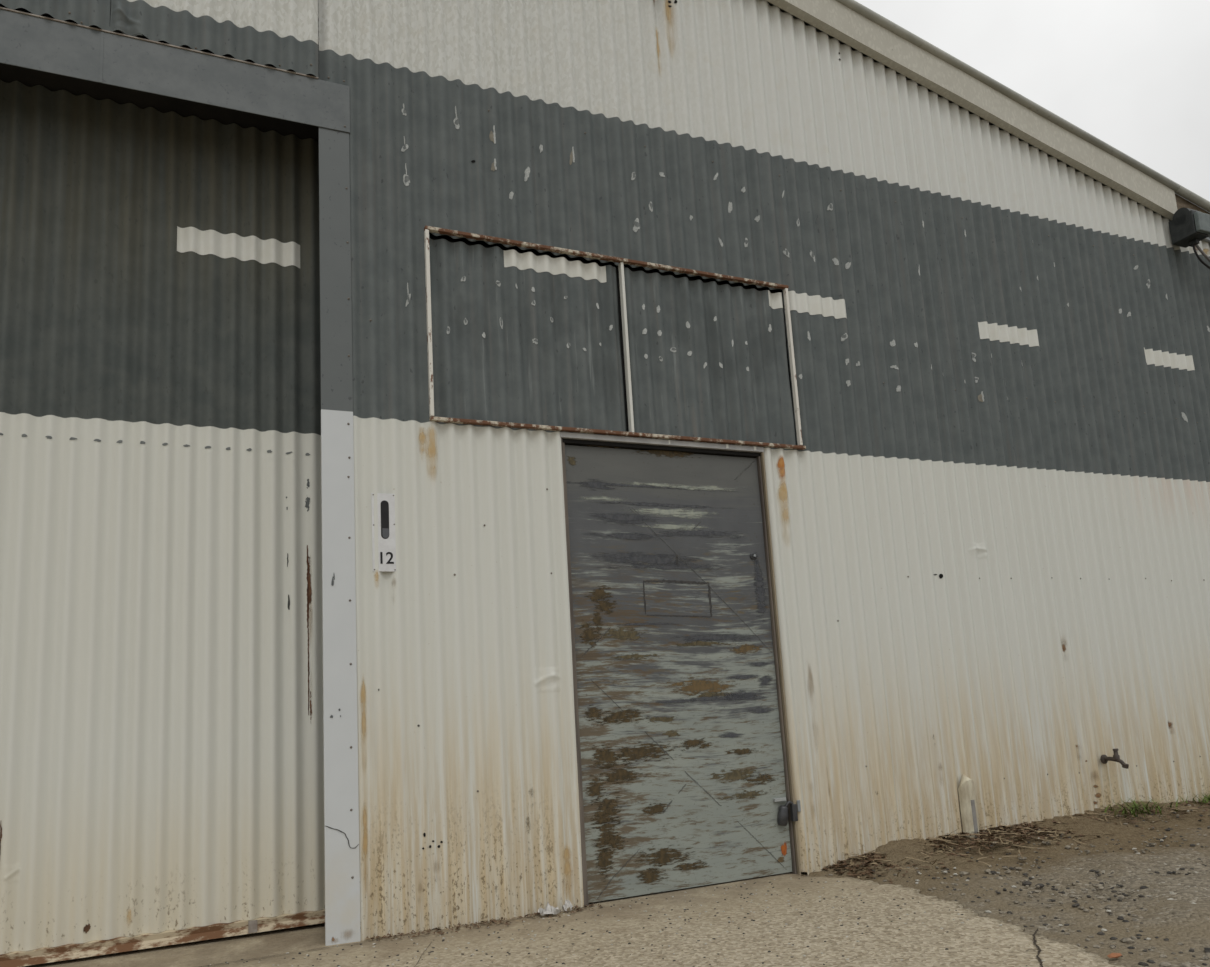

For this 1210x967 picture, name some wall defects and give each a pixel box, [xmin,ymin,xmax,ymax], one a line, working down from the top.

peeling [401,137,410,186]
rust [777,457,788,520]
rust [580,585,657,660]
rust [677,641,762,654]
rust [667,677,736,698]
rust [585,705,712,885]
rust [711,748,777,801]